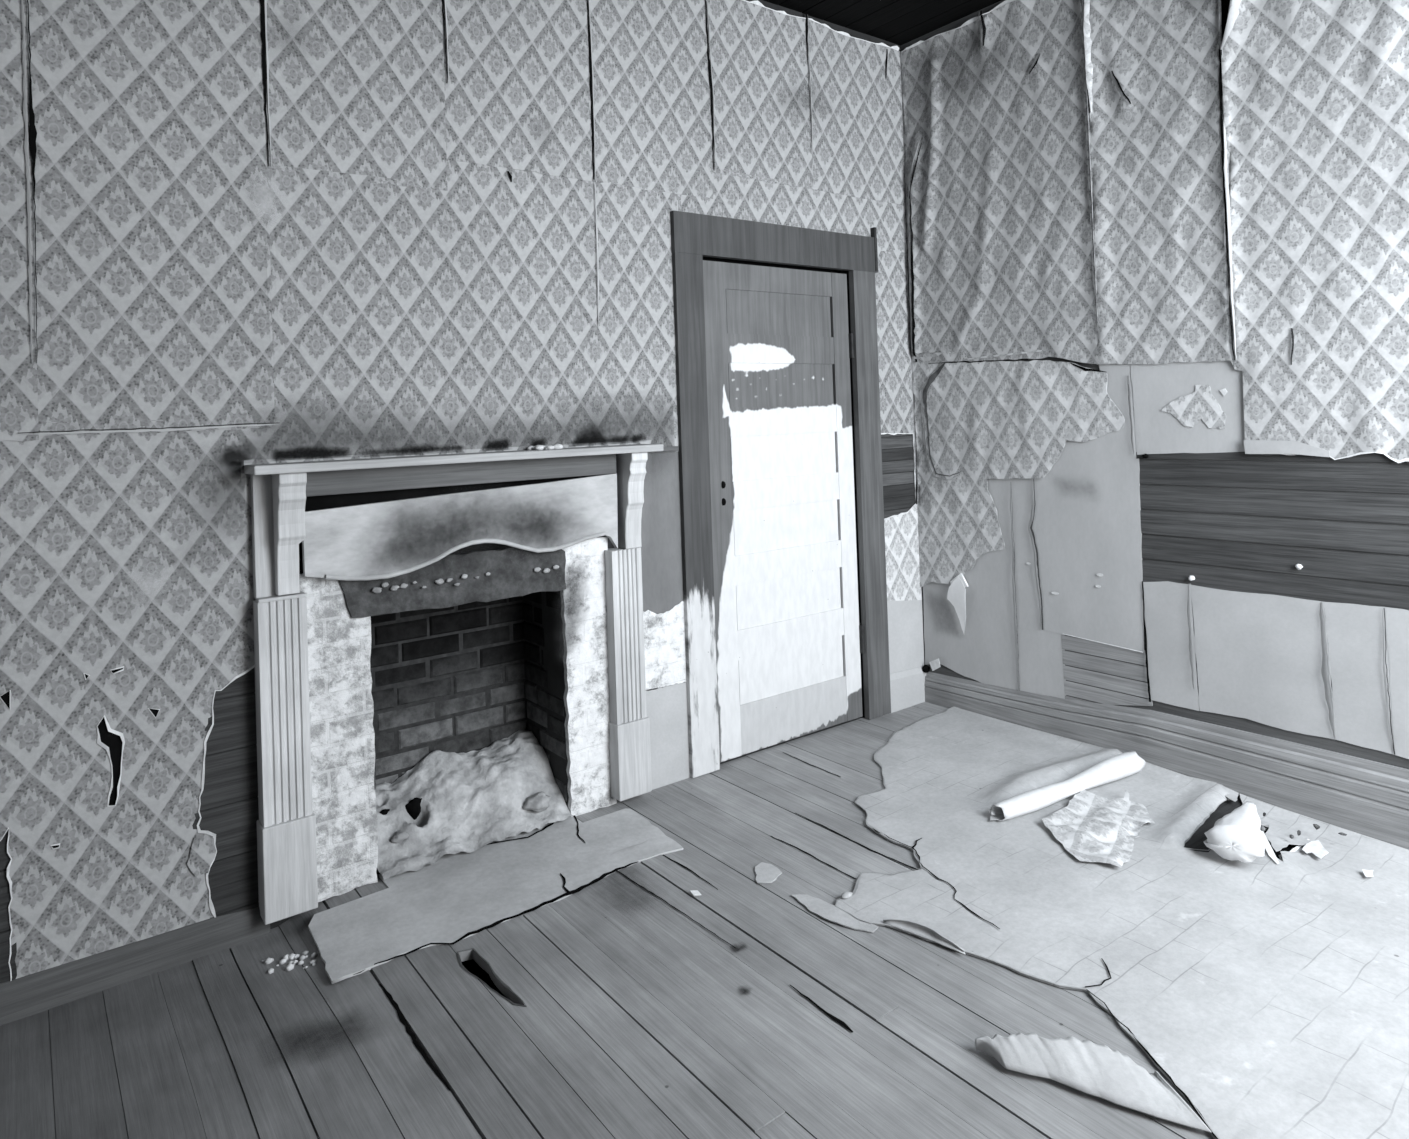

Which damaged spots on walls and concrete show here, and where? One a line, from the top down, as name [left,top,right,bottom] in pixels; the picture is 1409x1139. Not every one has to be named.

crack [260,0,272,166]
crack [441,0,449,83]
crack [587,0,595,179]
crack [21,0,37,363]
peeling [1136,452,1409,610]
peeling [1061,634,1153,706]
peeling [187,664,259,918]
peeling [0,827,17,983]
crack [331,815,648,984]
crack [873,828,1000,929]